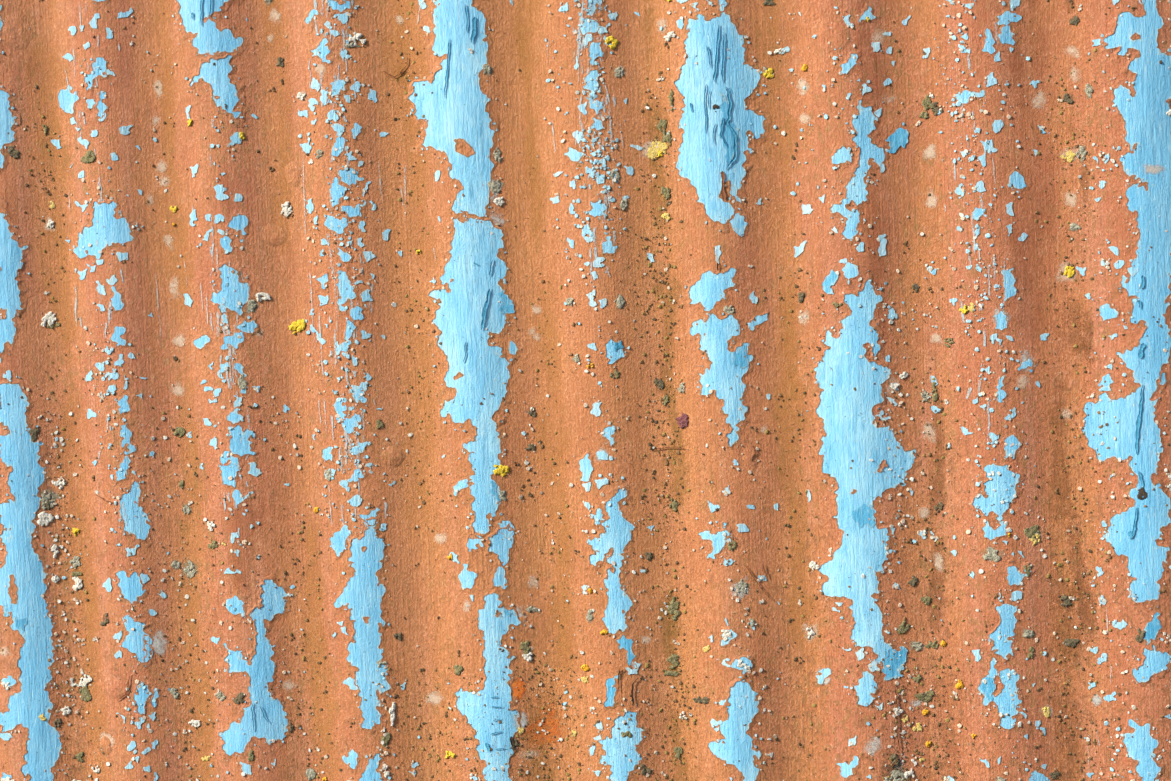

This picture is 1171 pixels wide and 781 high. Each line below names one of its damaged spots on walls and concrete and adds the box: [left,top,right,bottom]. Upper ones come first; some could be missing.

peeling [0,196,67,781]
peeling [65,189,167,781]
peeling [172,0,258,148]
peeling [211,532,295,775]
peeling [298,0,406,781]
peeling [403,0,529,781]
corrosion [512,678,525,699]
peeling [575,402,654,781]
peeling [671,0,776,465]
peeling [801,2,921,710]
peeling [966,432,1046,739]
peeling [1077,0,1171,686]